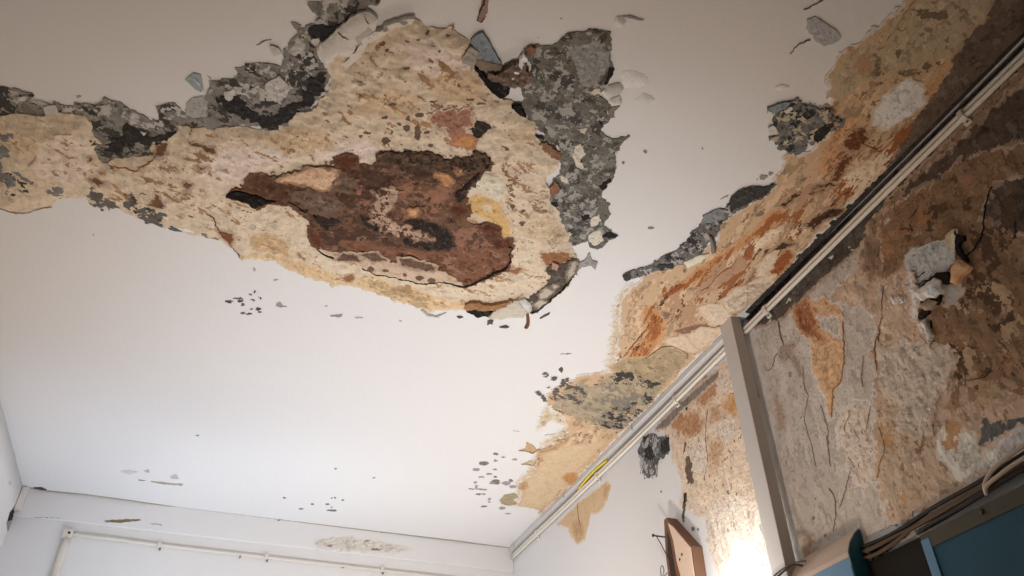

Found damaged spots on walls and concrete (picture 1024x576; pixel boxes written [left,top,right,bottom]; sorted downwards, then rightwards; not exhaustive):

peeling [185,72,211,118]
peeling [319,8,415,68]
spalling [461,0,630,270]
spalling [225,102,550,329]
rust [467,194,514,239]
peeling [684,234,716,268]
damp [511,0,1024,576]
crack [768,311,784,371]
rust [791,295,847,421]
crack [802,286,885,531]
flaking render [904,229,974,344]
crack [966,187,992,256]